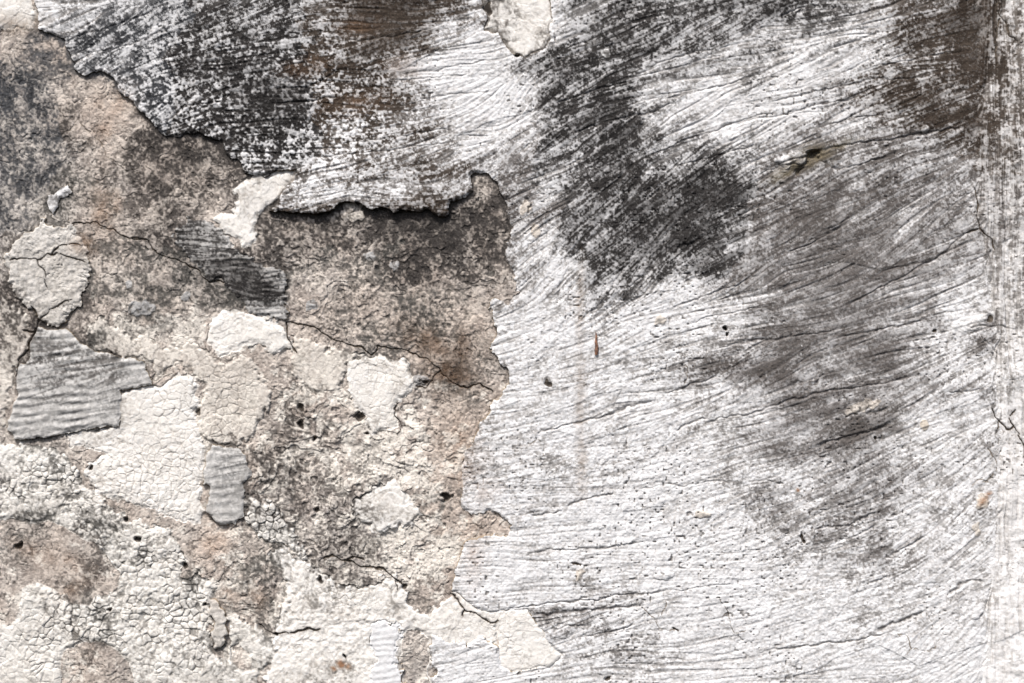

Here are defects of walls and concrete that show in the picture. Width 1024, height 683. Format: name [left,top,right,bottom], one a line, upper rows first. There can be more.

crack [10,222,225,375]
flaking render [0,0,563,683]
crack [243,496,403,590]
crack [451,593,499,624]